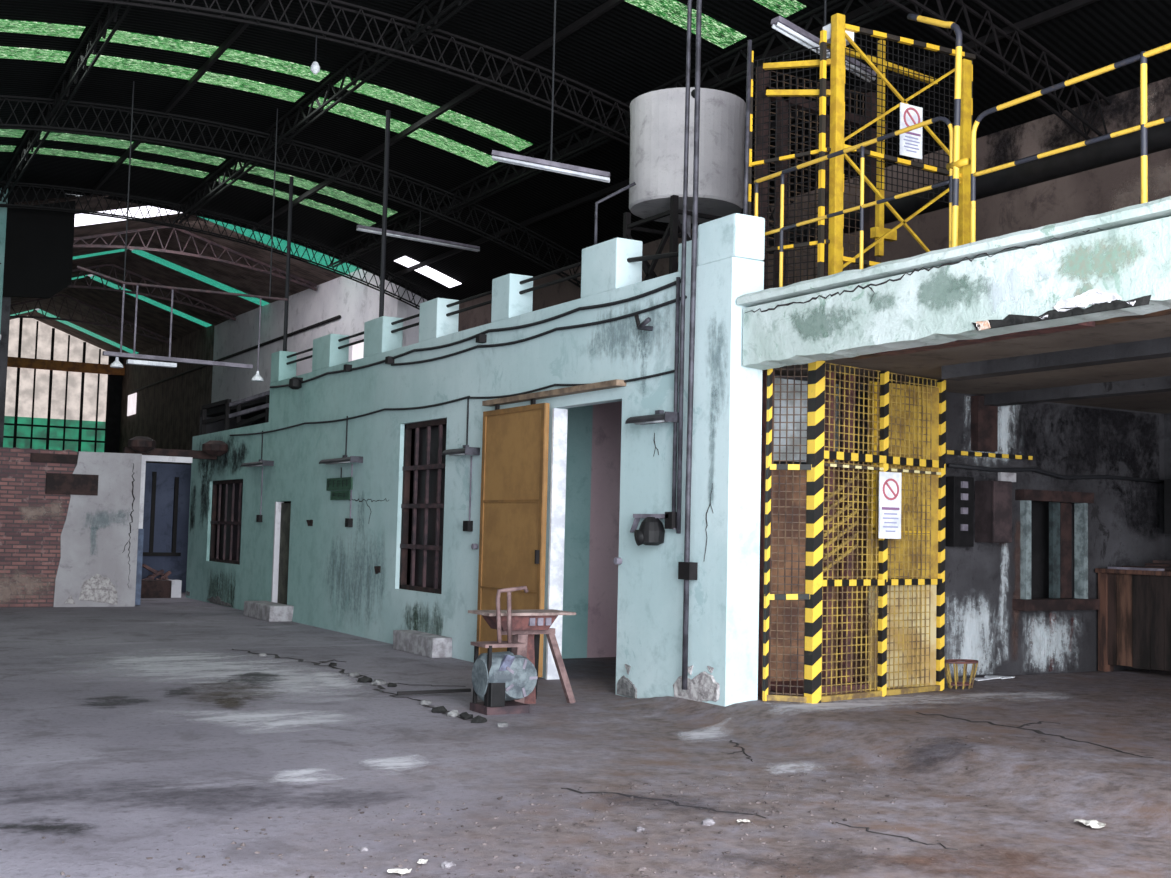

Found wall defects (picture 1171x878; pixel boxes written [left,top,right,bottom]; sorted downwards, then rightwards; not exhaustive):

peeling [21,503,62,521]
damp [950,522,1021,674]
spalling [673,665,720,702]
crack [915,712,1154,758]